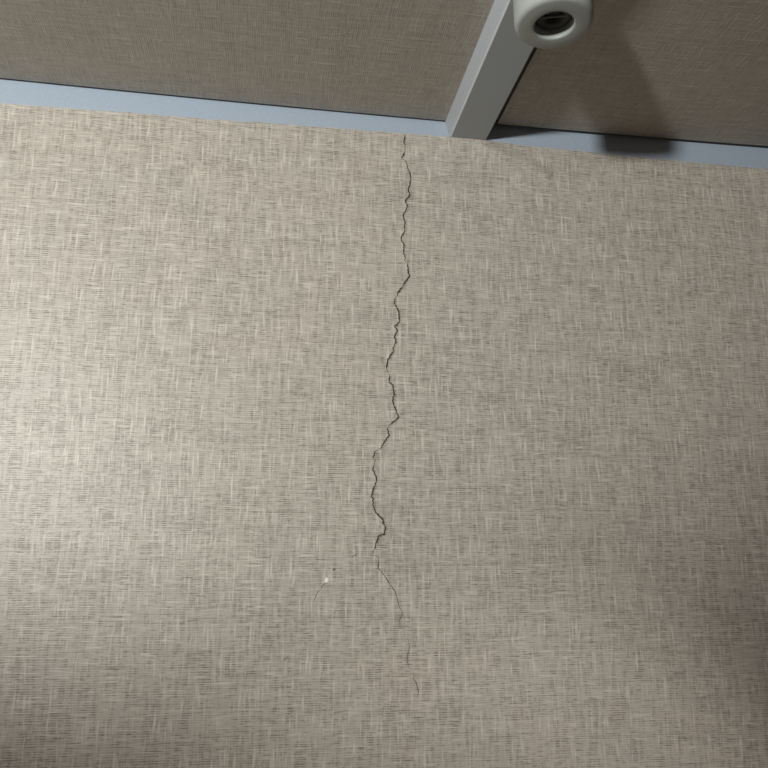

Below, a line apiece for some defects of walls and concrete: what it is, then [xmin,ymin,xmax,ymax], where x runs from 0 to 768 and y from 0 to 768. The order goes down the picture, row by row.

crack [352,135,419,719]